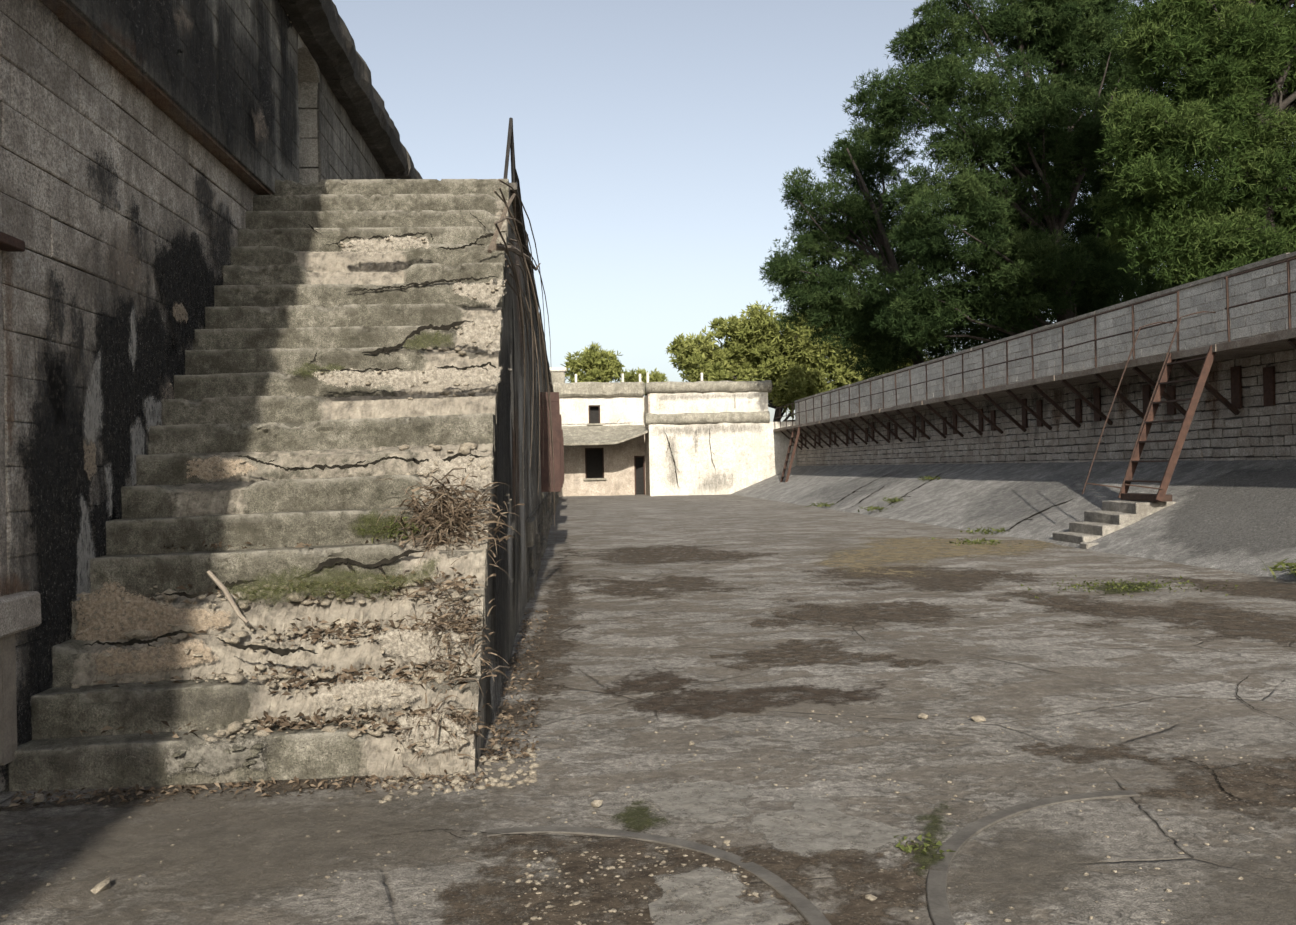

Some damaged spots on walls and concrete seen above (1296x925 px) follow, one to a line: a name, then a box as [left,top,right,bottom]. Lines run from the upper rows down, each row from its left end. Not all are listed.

water stain [159,0,238,148]
water stain [258,0,288,134]
crack [308,320,496,373]
water stain [9,152,235,746]
crack [234,453,526,471]
crack [164,580,256,599]
crack [299,549,428,577]
crack [85,630,318,657]